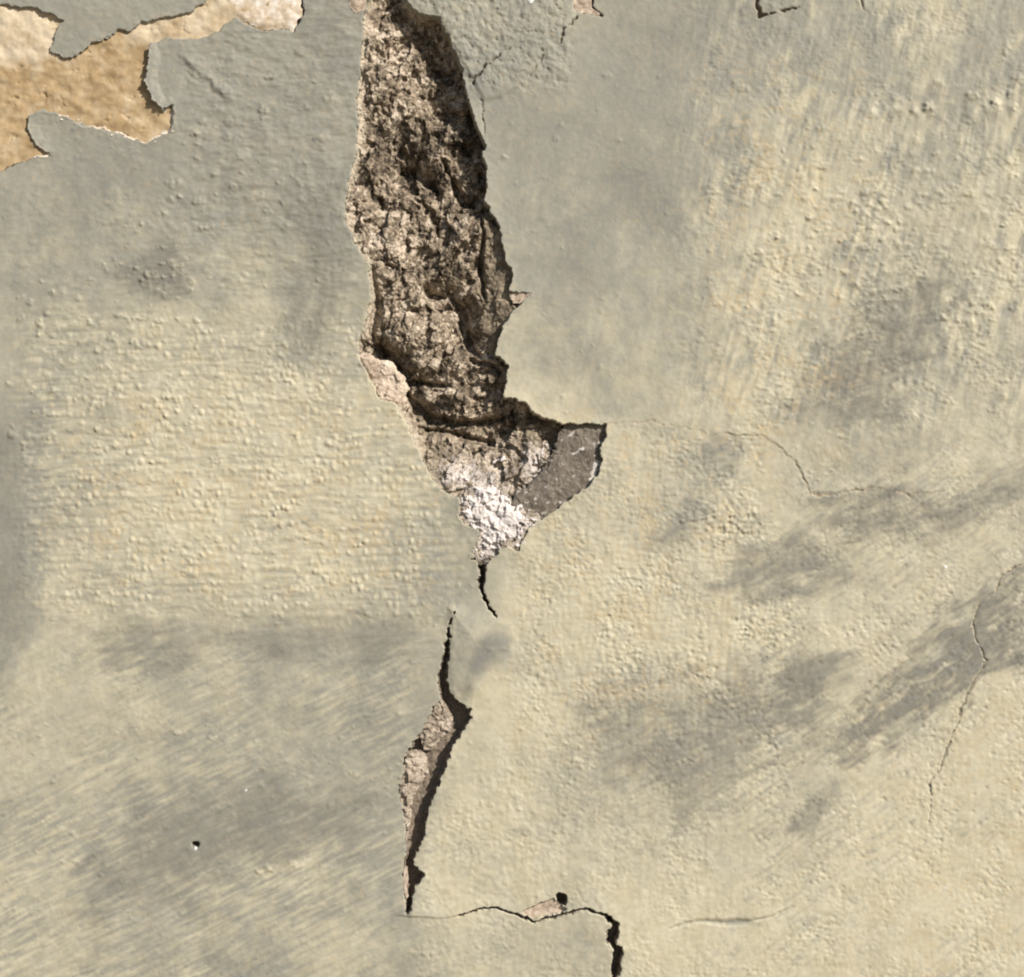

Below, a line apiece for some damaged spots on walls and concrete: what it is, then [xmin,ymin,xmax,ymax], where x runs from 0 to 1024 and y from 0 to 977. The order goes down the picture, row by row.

peeling [0,0,303,172]
spalling [345,0,606,565]
crack [400,611,472,914]
crack [471,558,497,617]
crack [928,563,1024,818]
crack [458,892,623,977]